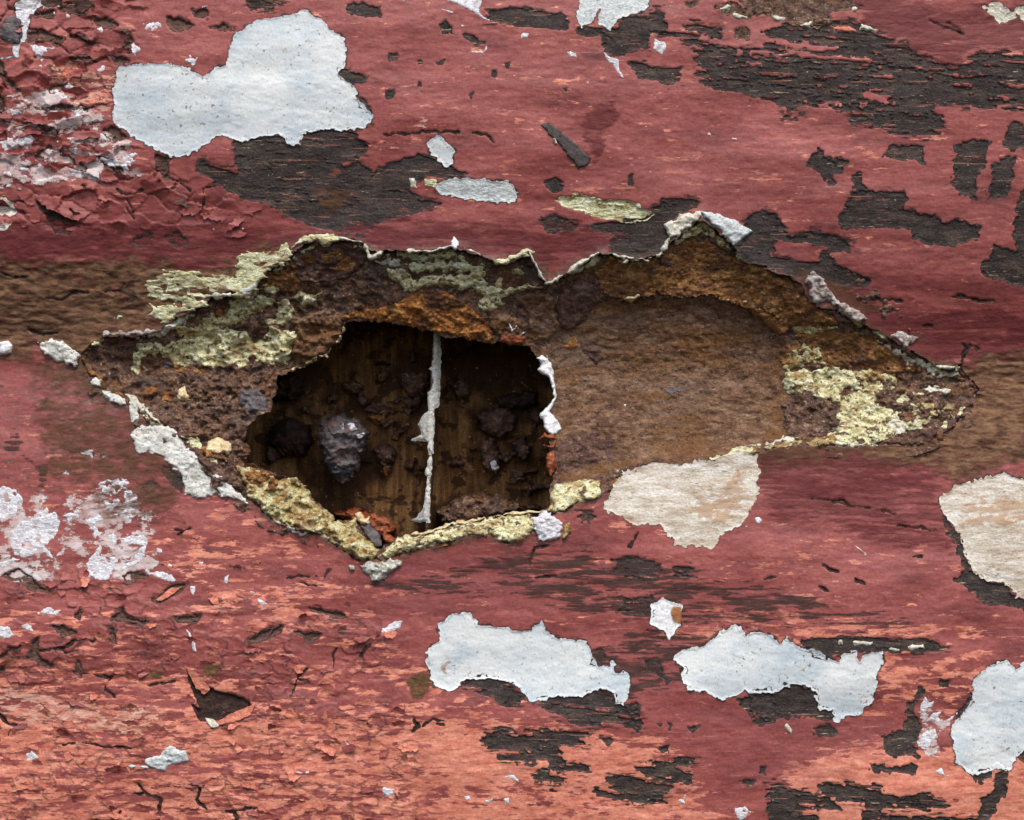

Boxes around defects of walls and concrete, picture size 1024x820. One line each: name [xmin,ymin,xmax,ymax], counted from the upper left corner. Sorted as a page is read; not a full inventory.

peeling [0,0,518,248]
peeling [439,0,1024,290]
peeling [574,449,762,549]
crack [0,713,18,736]
crack [38,633,116,698]
crack [62,741,132,749]
crack [411,718,445,732]
peeling [425,612,701,808]
peeling [645,624,952,737]
peeling [739,660,1024,820]
crack [93,783,163,820]
crack [195,785,258,820]